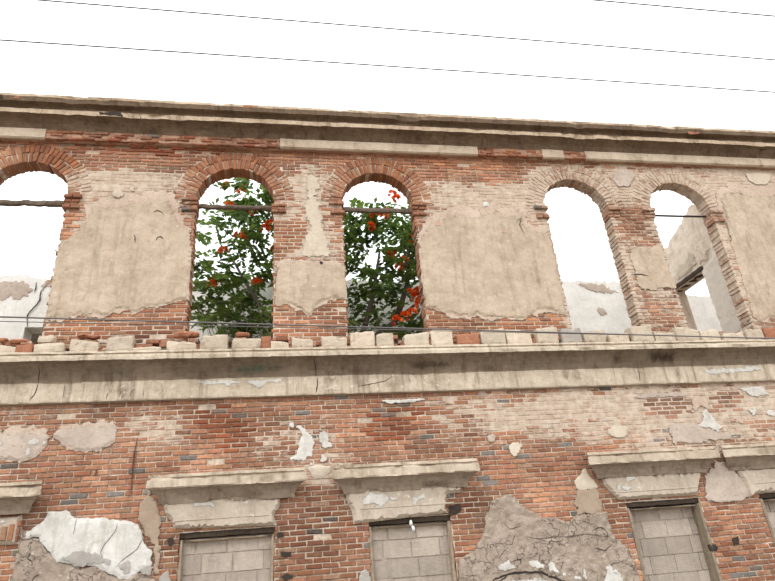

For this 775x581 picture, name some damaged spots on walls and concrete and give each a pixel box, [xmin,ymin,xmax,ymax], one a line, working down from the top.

crack [27,279,51,326]
flaking render [634,386,775,445]
flaking render [0,419,119,463]
peeling [289,423,334,466]
flaking render [0,510,184,581]
spalling [703,504,775,581]
crack [493,571,565,581]